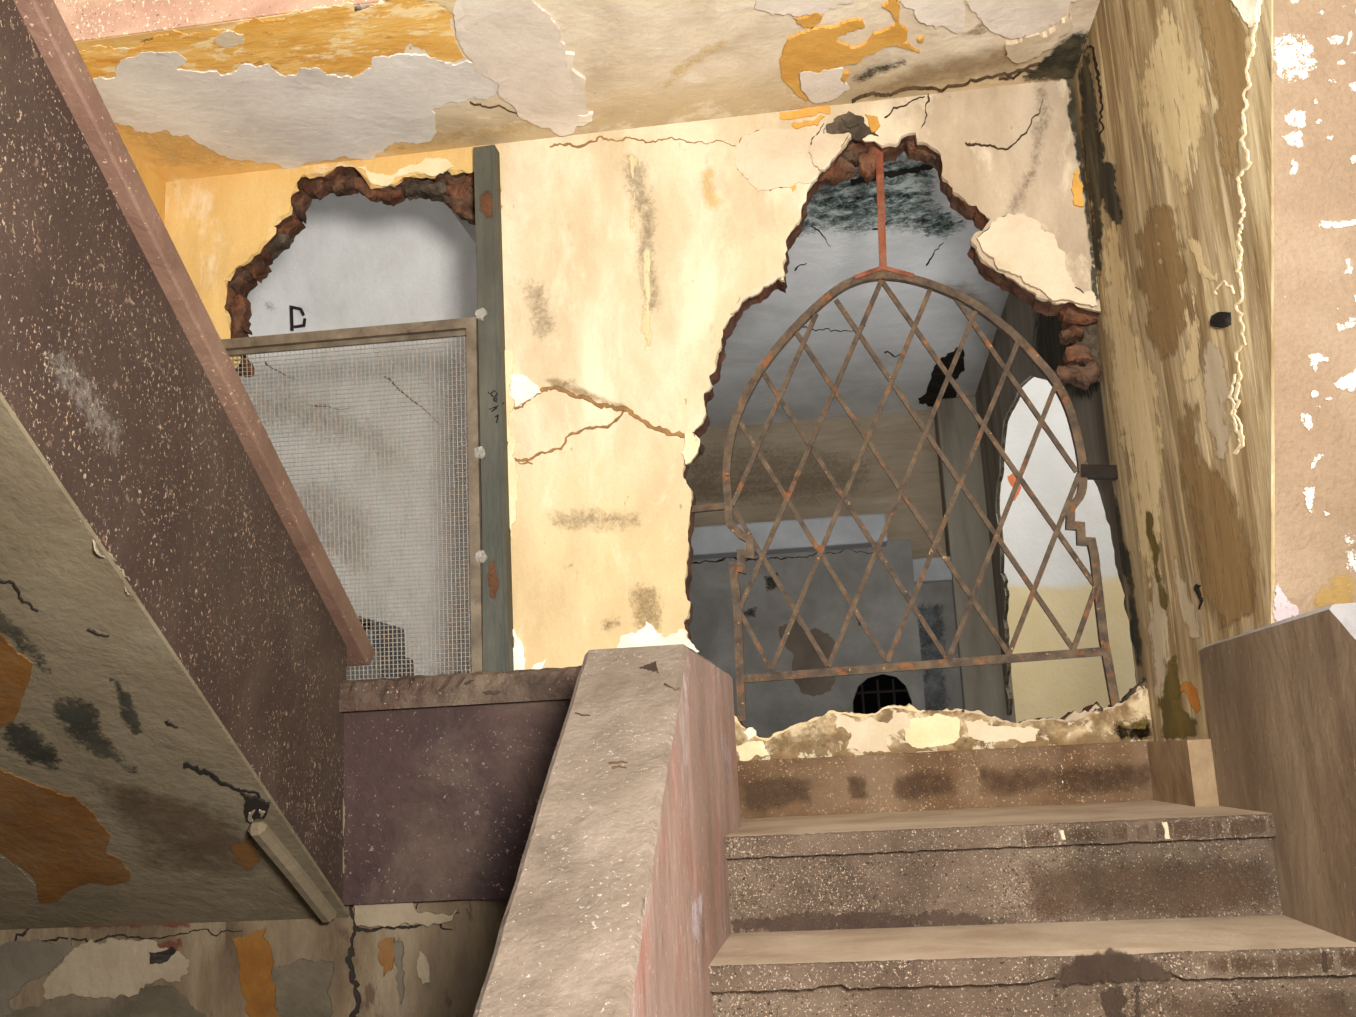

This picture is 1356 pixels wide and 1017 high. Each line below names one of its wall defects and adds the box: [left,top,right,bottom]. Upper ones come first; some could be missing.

peeling [78,0,593,335]
crack [550,136,736,149]
crack [852,62,1043,151]
peeling [731,0,1262,761]
crack [514,385,695,464]
leakage [3,722,61,770]
leakage [54,697,137,773]
leakage [110,678,143,735]
peeling [6,938,206,1017]
crack [345,903,460,1017]
peeling [354,902,459,1004]
leakage [1100,986,1141,1017]